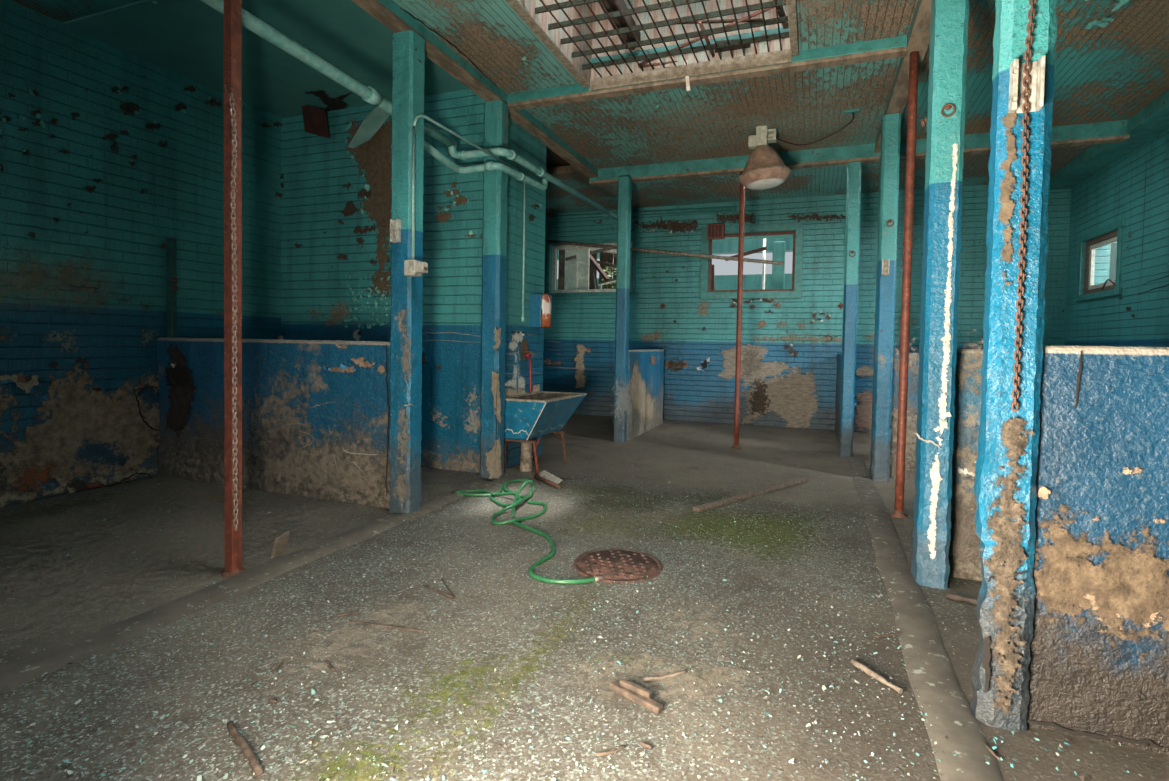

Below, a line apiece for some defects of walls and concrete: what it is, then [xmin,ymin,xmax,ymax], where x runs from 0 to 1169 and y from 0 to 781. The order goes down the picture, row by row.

peeling [0,371,50,400]
spalling [139,322,197,437]
spalling [310,275,414,391]
spalling [429,326,527,441]
spalling [574,344,590,389]
peeling [651,350,735,379]
flaking render [854,365,874,433]
spalling [927,143,958,560]
spalling [0,407,957,781]
spalling [973,417,1169,717]